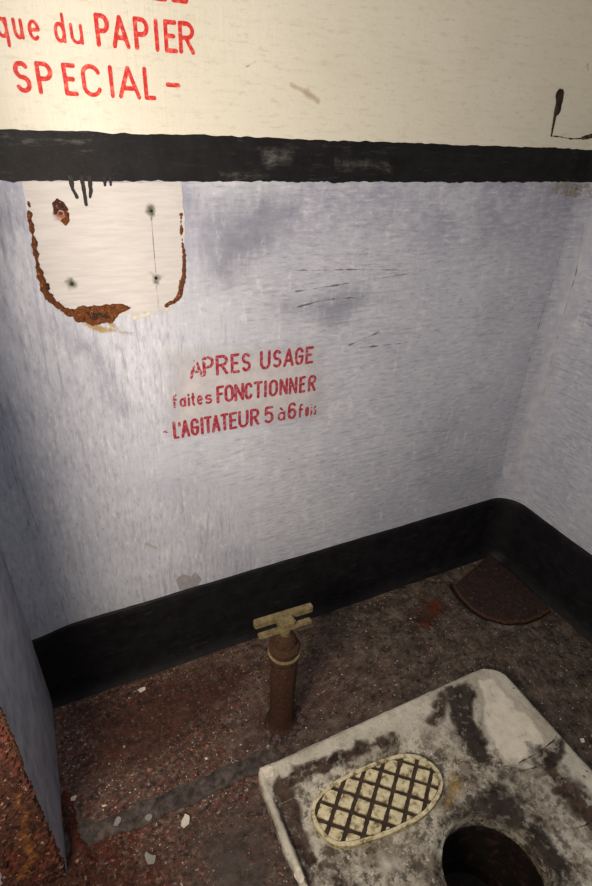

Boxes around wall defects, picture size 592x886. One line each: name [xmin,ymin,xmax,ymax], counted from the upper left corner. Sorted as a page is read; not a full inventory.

rust [27,198,131,326]
peeling [22,181,186,317]
rust [164,213,186,307]
rust [0,707,66,886]